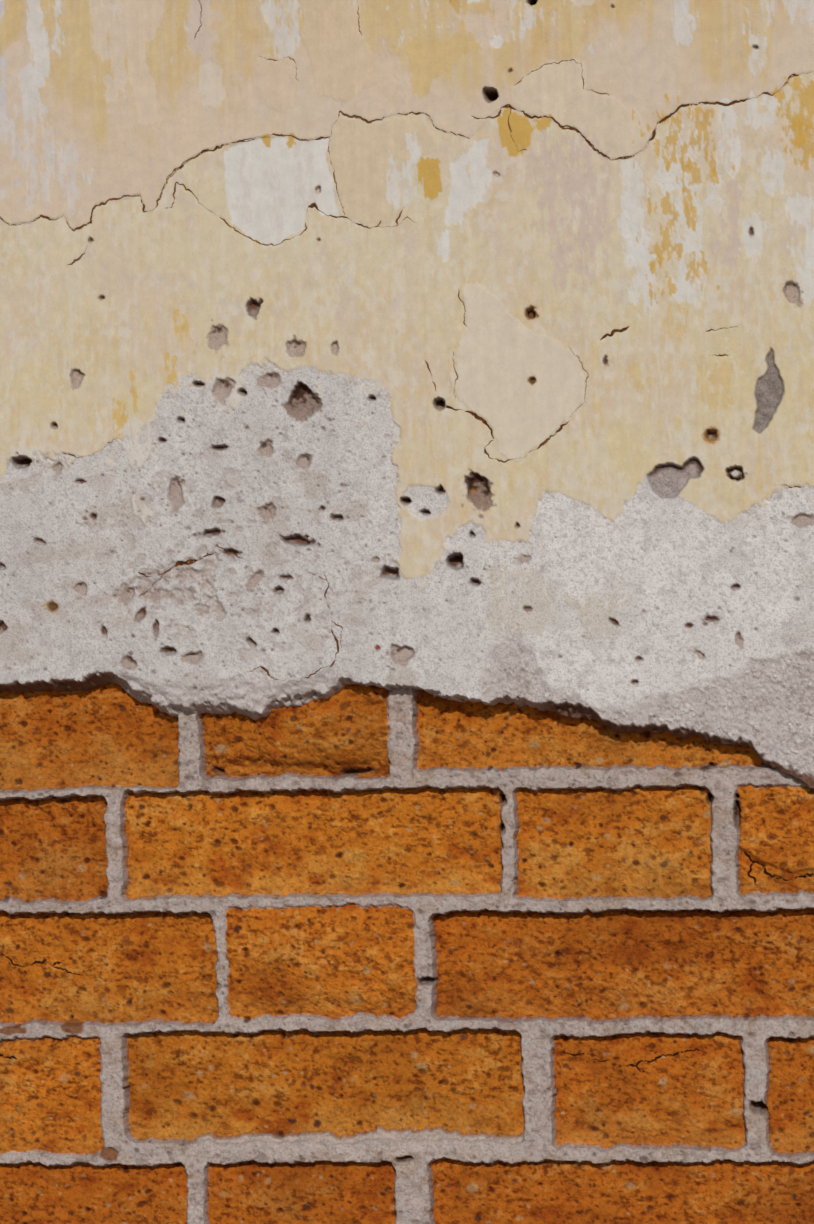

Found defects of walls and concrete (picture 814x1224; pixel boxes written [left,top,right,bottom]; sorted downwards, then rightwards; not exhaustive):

peeling [88,0,168,128]
peeling [186,0,225,112]
peeling [222,0,439,248]
crack [0,59,810,265]
peeling [436,137,500,269]
peeling [447,0,545,52]
peeling [450,284,588,464]
crack [425,292,629,463]
flaking render [0,318,814,896]
peeling [98,1147,121,1164]